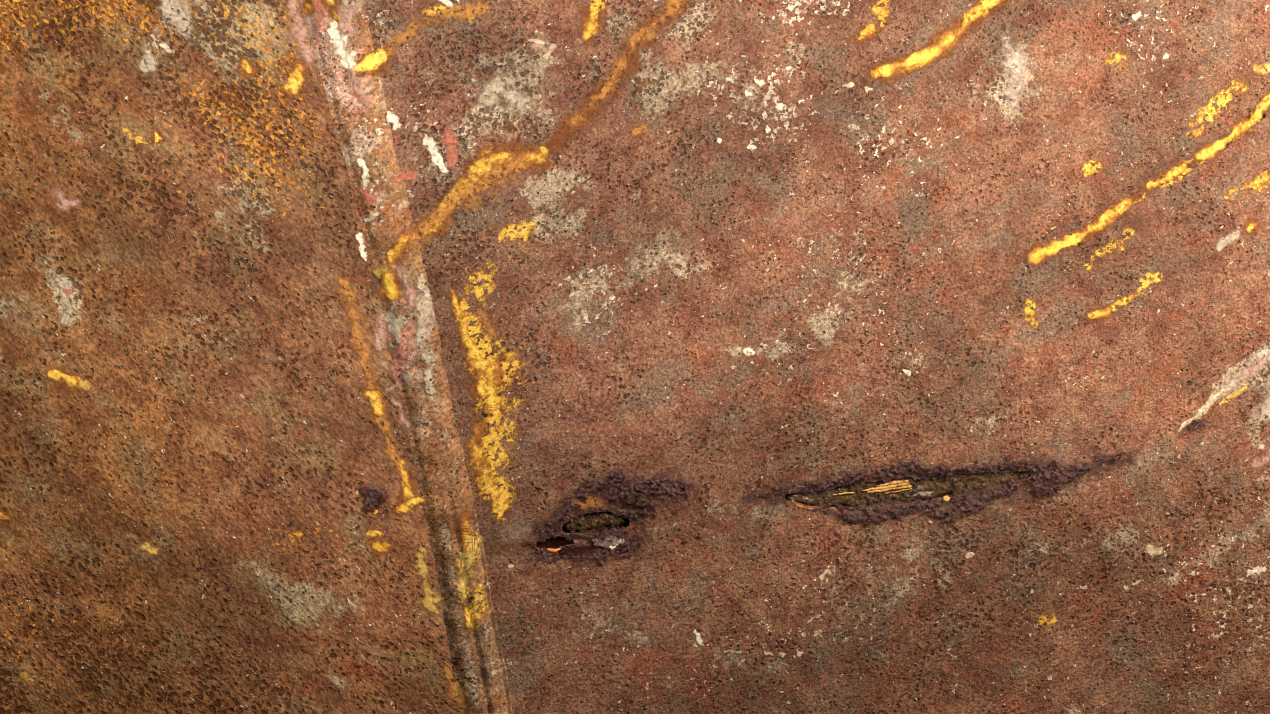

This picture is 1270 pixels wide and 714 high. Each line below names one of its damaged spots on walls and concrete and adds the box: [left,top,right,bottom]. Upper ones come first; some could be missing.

corrosion [277,62,308,104]
corrosion [352,2,489,76]
corrosion [854,0,895,44]
corrosion [869,0,1009,84]
corrosion [373,0,692,302]
corrosion [1023,63,1270,271]
corrosion [1086,272,1162,322]
corrosion [47,366,91,393]
corrosion [338,279,425,517]
corrosion [449,259,534,521]
corrosion [748,452,1125,528]
corrosion [452,511,489,630]